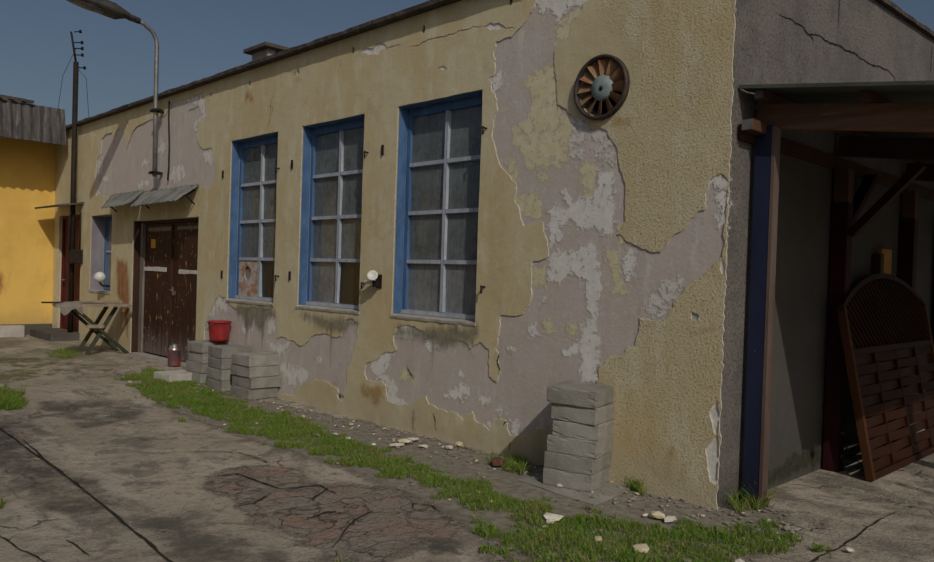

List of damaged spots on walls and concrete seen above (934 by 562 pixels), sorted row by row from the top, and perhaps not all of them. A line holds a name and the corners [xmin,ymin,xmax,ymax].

flaking render [360,43,387,55]
crack [779,0,896,81]
flaking render [95,93,216,197]
flaking render [365,0,733,436]
flaking render [205,295,358,400]
flaking render [706,401,721,485]